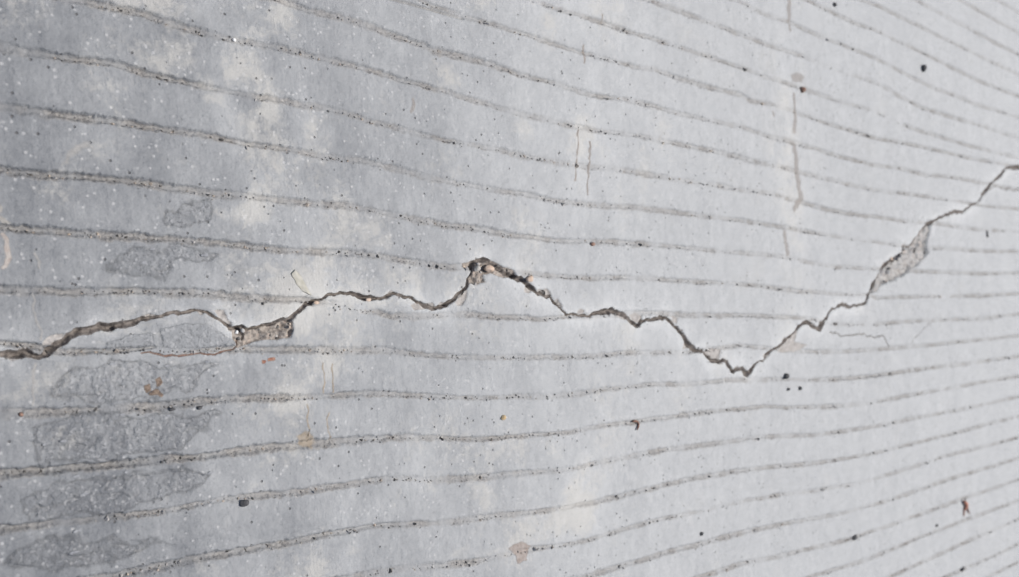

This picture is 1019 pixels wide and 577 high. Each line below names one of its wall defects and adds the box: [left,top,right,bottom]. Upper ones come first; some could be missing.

crack [0,165,1019,377]
spalling [868,226,929,293]
spalling [232,320,293,348]